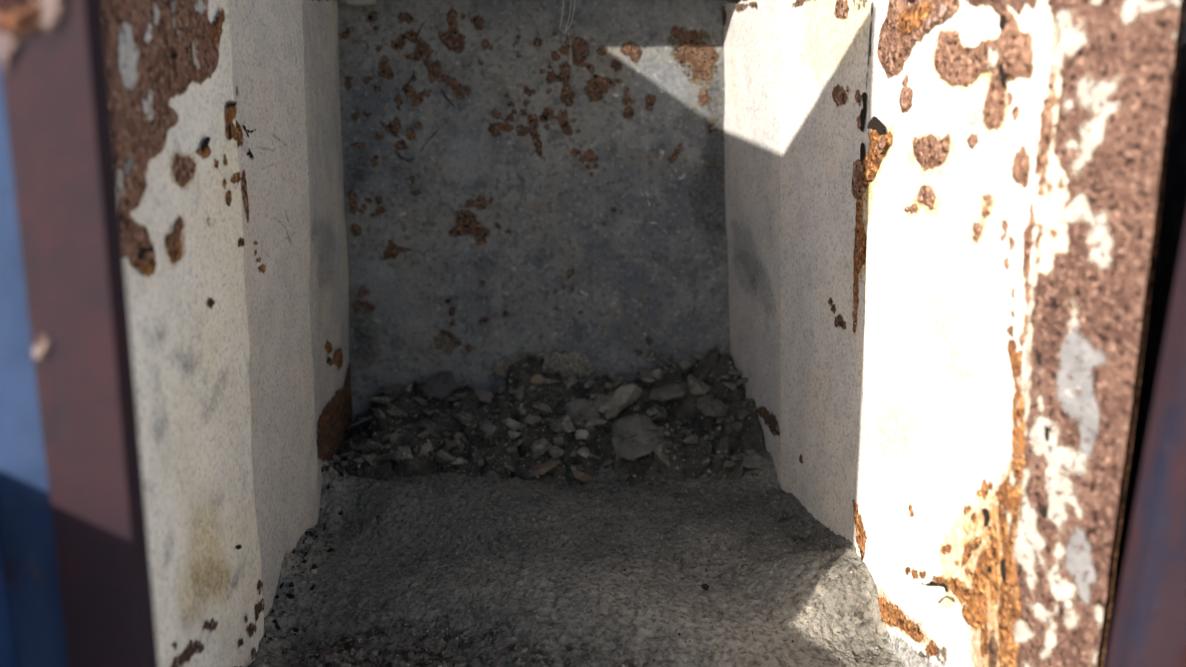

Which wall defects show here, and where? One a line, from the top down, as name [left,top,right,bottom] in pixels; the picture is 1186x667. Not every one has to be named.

corrosion [834,0,867,19]
corrosion [102,0,225,278]
corrosion [344,9,493,167]
corrosion [488,29,656,176]
corrosion [669,25,719,106]
corrosion [832,85,862,107]
corrosion [851,116,892,199]
corrosion [448,193,511,246]
corrosion [877,0,1182,667]
corrosion [317,340,353,461]
corrosion [852,500,867,560]
corrosion [238,580,265,660]